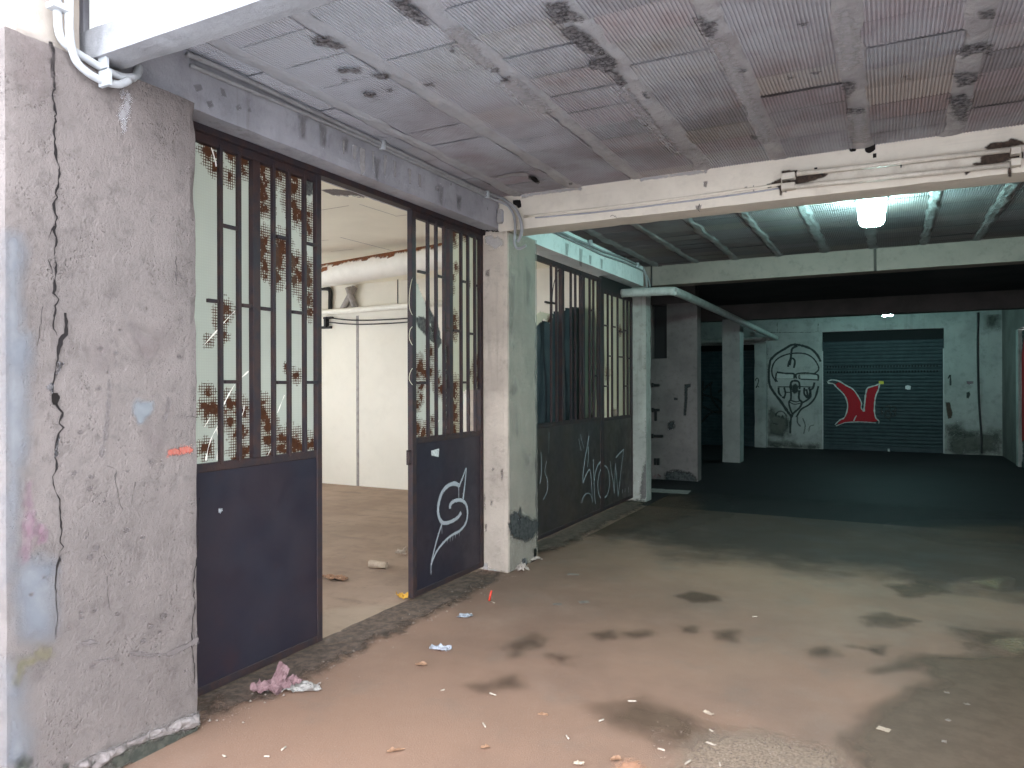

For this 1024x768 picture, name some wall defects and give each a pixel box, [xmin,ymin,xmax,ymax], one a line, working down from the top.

crack [36,41,68,640]
corrosion [321,243,442,272]